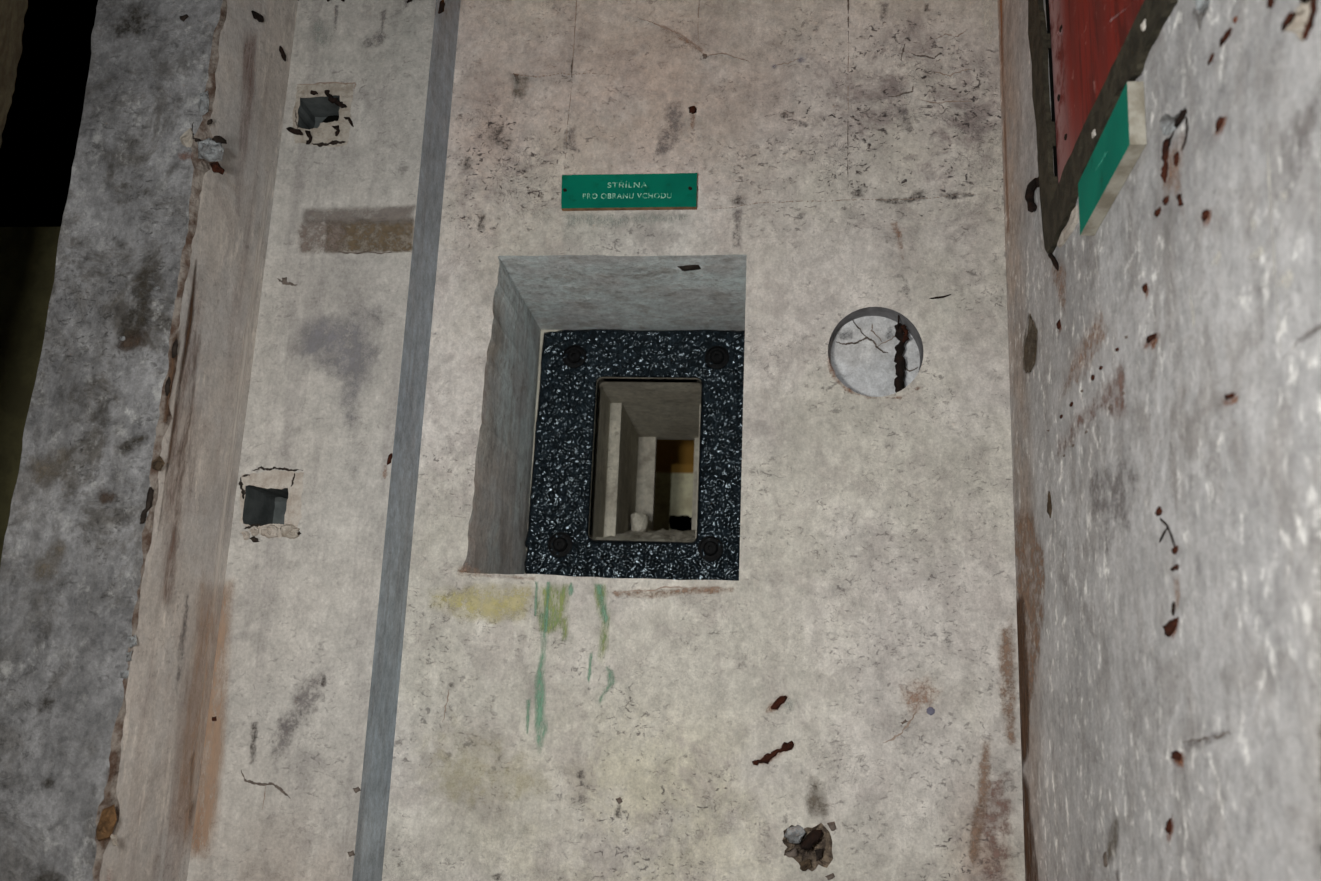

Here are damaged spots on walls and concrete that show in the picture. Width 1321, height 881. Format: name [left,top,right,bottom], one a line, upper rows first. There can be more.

corrosion [1207,16,1237,65]
spalling [180,91,227,175]
hole [286,82,357,147]
corrosion [1154,107,1188,217]
crack [837,320,918,372]
crack [1281,326,1321,360]
water stain [164,342,198,600]
hole [239,466,304,542]
water stain [1000,629,1015,743]
spalling [782,784,837,880]
water stain [970,745,1009,879]